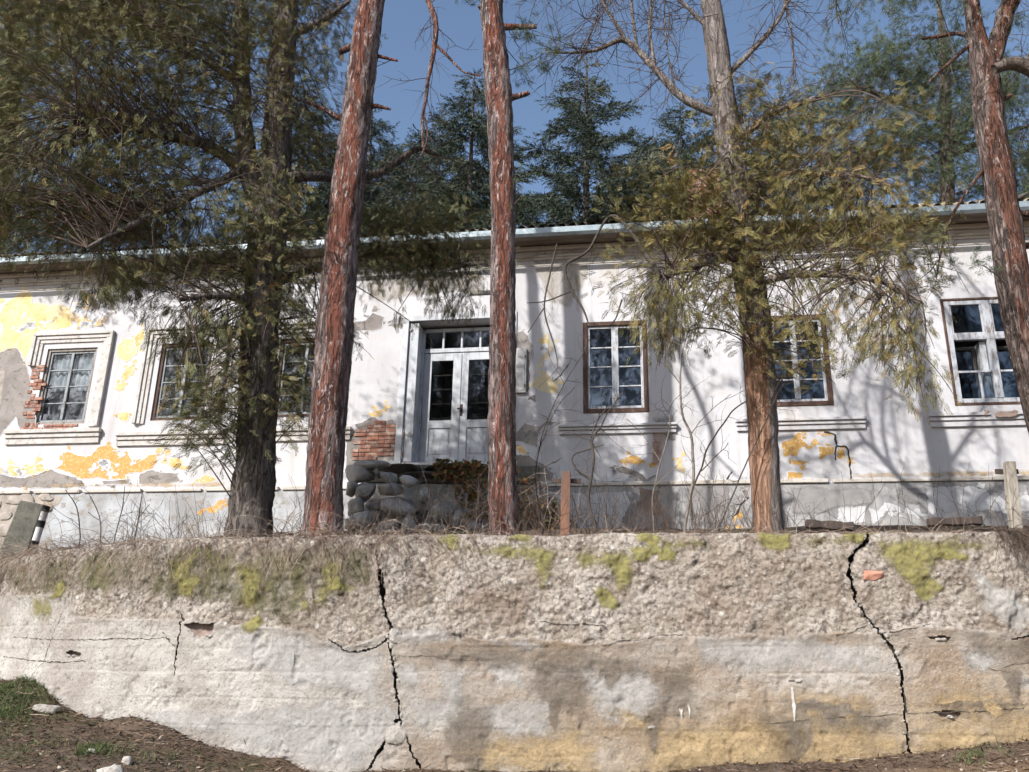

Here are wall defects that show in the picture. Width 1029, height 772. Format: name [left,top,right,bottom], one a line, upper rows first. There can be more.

spalling [0,286,117,436]
peeling [115,325,146,391]
peeling [515,329,564,402]
peeling [0,442,216,548]
peeling [114,411,132,422]
spalling [344,400,412,473]
peeling [780,430,855,479]
crack [824,431,852,479]
crack [4,594,185,678]
crack [328,550,499,771]
crack [757,531,1029,754]
water stain [416,639,895,772]